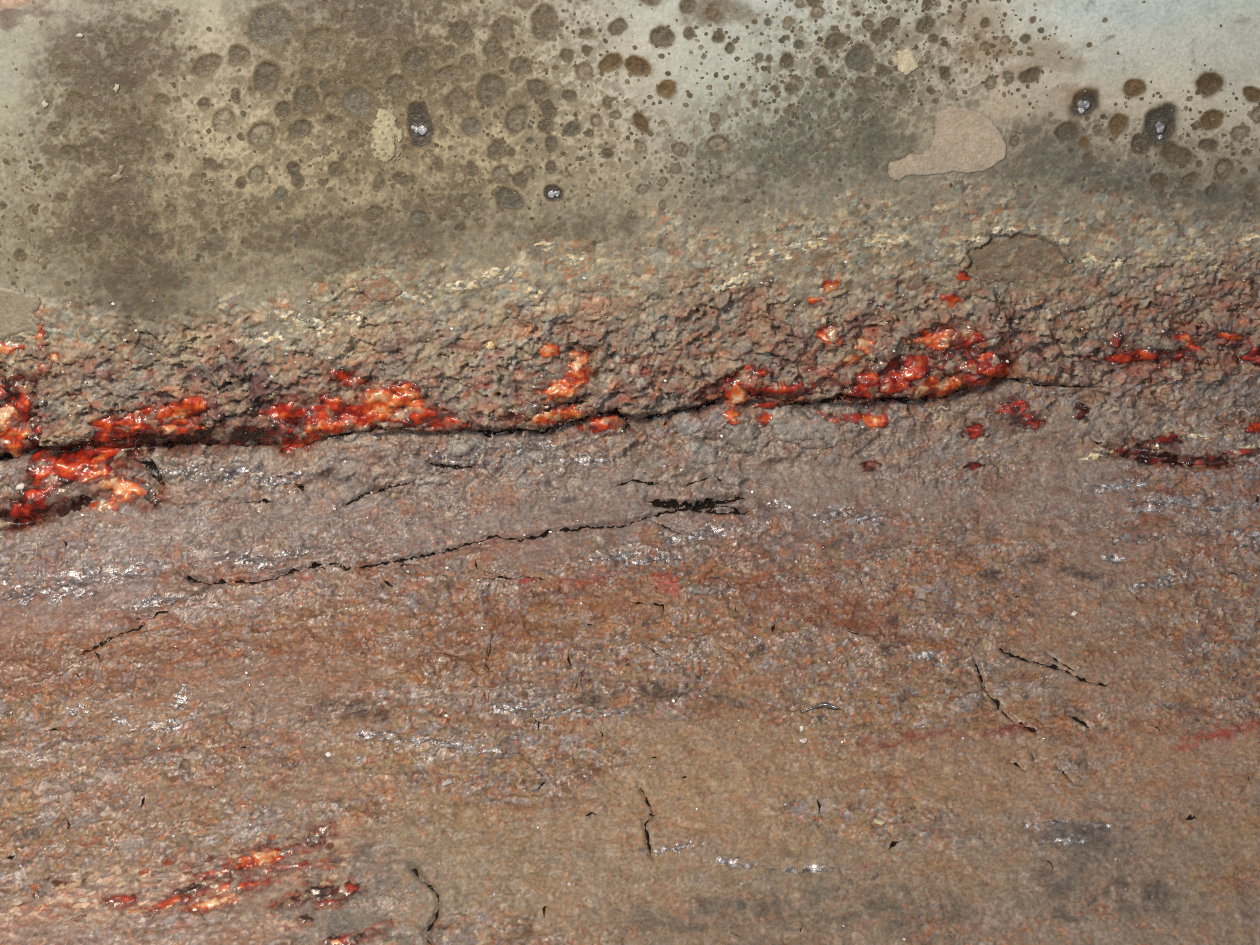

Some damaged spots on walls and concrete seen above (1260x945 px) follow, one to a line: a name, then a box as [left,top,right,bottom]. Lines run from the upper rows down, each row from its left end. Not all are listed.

damp [49,14,179,118]
damp [288,0,434,64]
spalling [752,0,825,69]
spalling [813,0,950,102]
peeling [888,106,1018,180]
damp [68,144,182,316]
rust [0,325,486,531]
rust [497,341,620,436]
rust [668,321,1017,455]
crack [184,499,745,585]
crack [80,611,168,655]
crack [410,868,439,945]